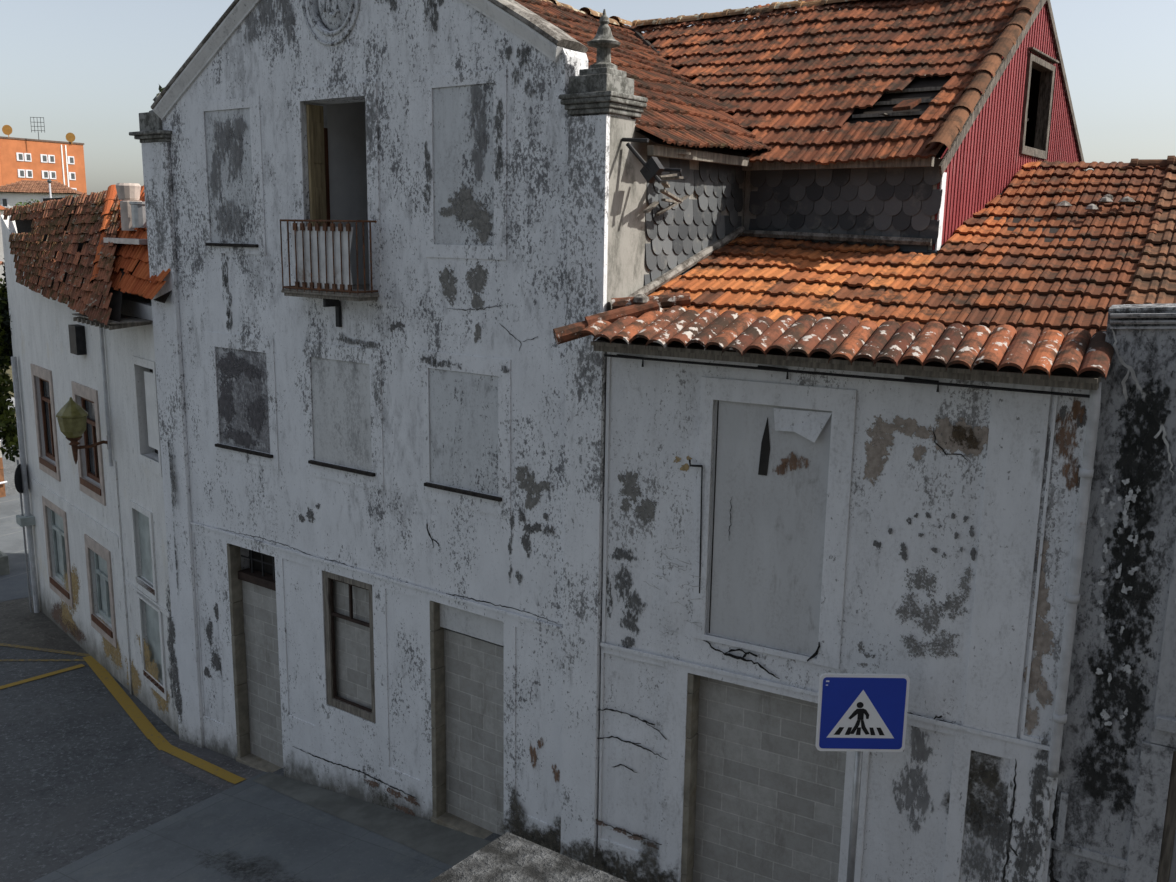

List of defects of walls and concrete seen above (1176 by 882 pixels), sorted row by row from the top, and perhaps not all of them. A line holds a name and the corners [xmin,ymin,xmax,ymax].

peeling [439,261,488,343]
peeling [863,414,989,485]
peeling [515,465,555,557]
peeling [617,471,657,527]
peeling [873,512,976,660]
water stain [1077,369,1175,821]
water stain [501,789,676,882]
crack [597,708,667,773]
water stain [893,726,934,831]
water stain [957,733,1052,882]
crack [1003,759,1018,879]
crack [1049,788,1059,882]